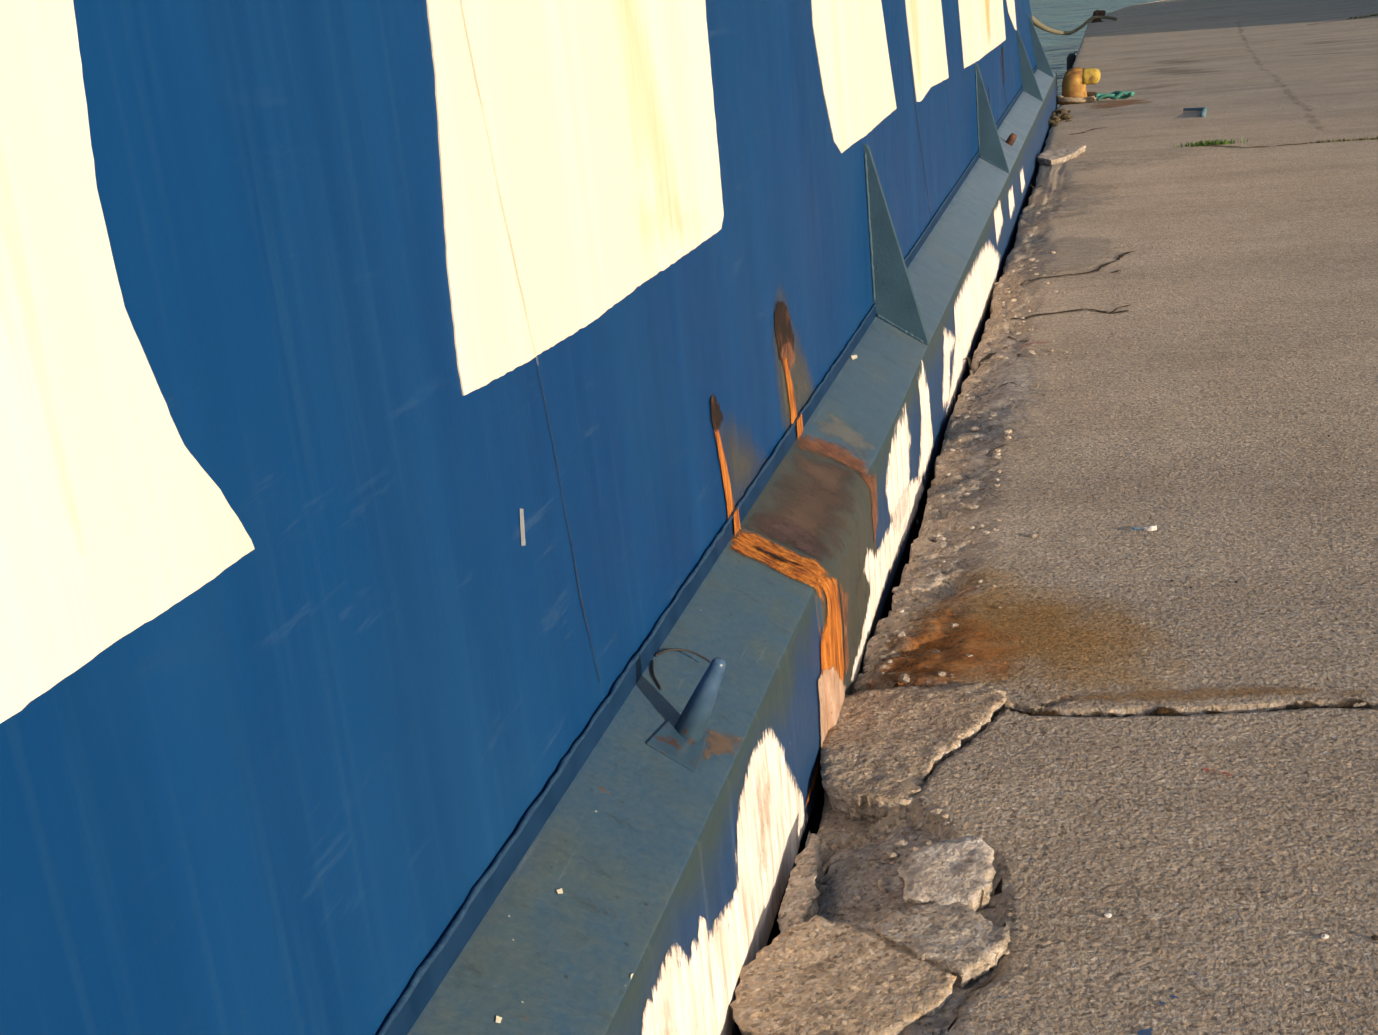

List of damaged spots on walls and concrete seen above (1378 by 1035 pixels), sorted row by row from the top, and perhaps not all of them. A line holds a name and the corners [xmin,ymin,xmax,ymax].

crack [964,250,1137,395]
spalling [939,333,1041,519]
rust [885,588,1016,688]
crack [922,697,1374,787]
rust [1063,687,1312,701]
spalling [816,827,927,929]
spalling [977,867,1013,928]
spalling [900,968,993,1035]